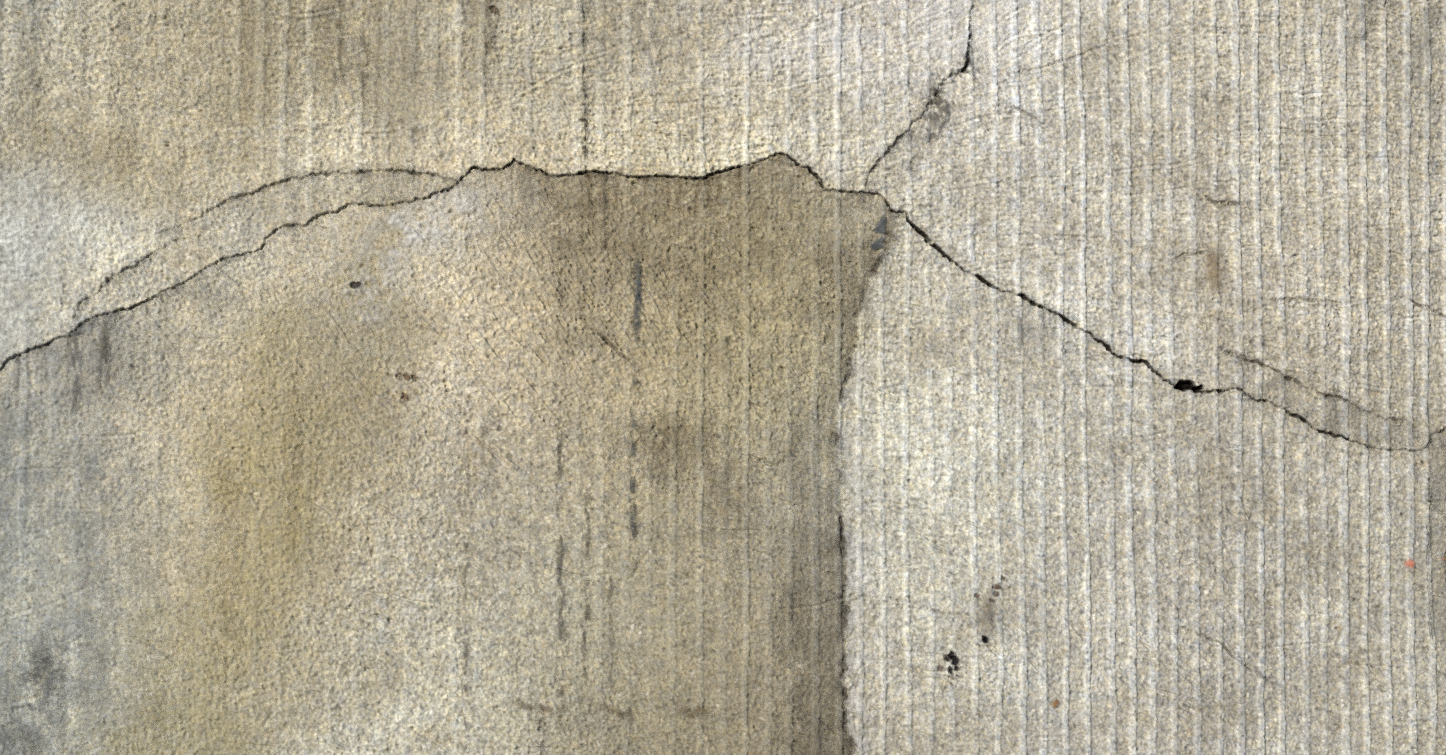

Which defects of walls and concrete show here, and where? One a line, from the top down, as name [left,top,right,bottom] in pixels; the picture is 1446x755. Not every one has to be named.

crack [3,255,175,367]
leakage [357,195,472,298]
leakage [560,157,786,378]
crack [225,0,1366,446]
crack [834,346,856,472]
crack [840,516,848,555]
crack [841,589,854,743]